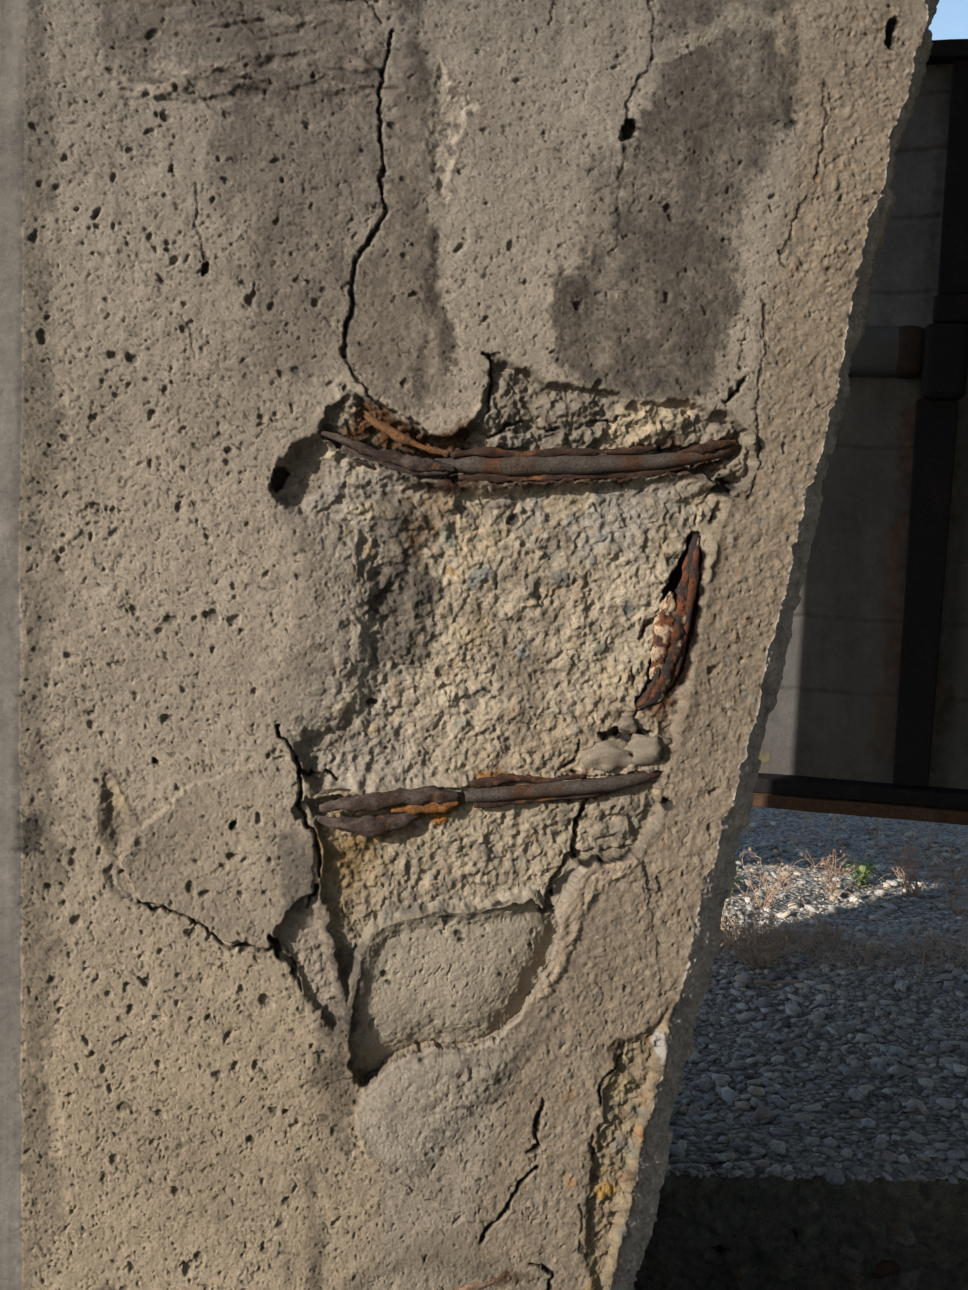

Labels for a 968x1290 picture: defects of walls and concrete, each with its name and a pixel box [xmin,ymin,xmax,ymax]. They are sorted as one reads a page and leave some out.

crack [342,30,428,433]
damp [405,204,458,369]
damp [552,1,798,397]
crack [725,299,767,403]
rust [346,402,470,460]
rust [423,460,723,495]
rust [657,435,684,453]
spalling [271,353,760,1084]
crack [275,724,339,908]
rust [415,806,457,824]
crack [139,901,302,990]
crack [480,1101,543,1241]